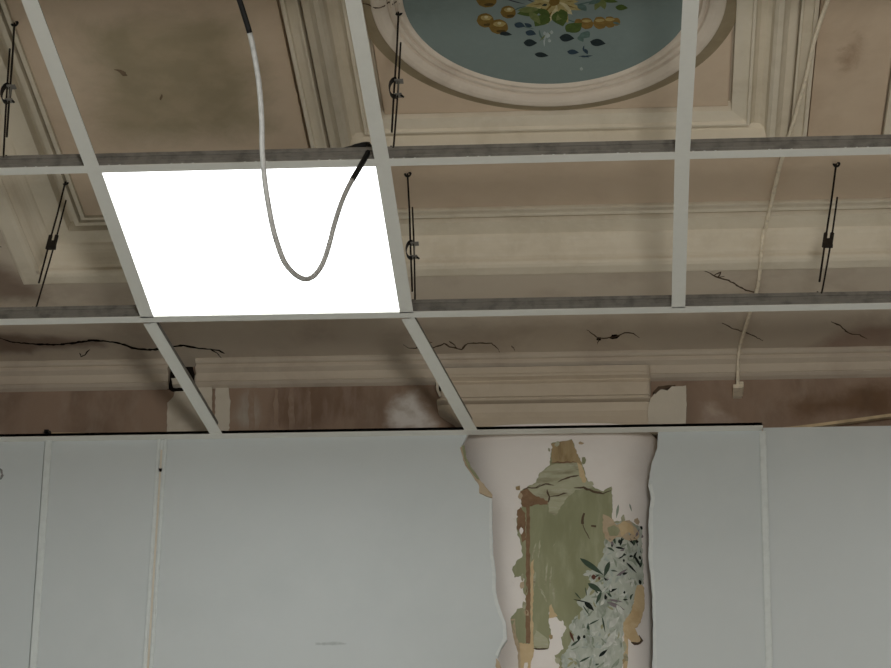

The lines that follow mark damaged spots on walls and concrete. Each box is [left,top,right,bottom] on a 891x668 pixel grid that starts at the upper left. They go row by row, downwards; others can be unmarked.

crack [705,271,755,293]
crack [0,338,225,358]
crack [404,341,515,351]
crack [587,330,638,344]
peeling [511,439,640,668]